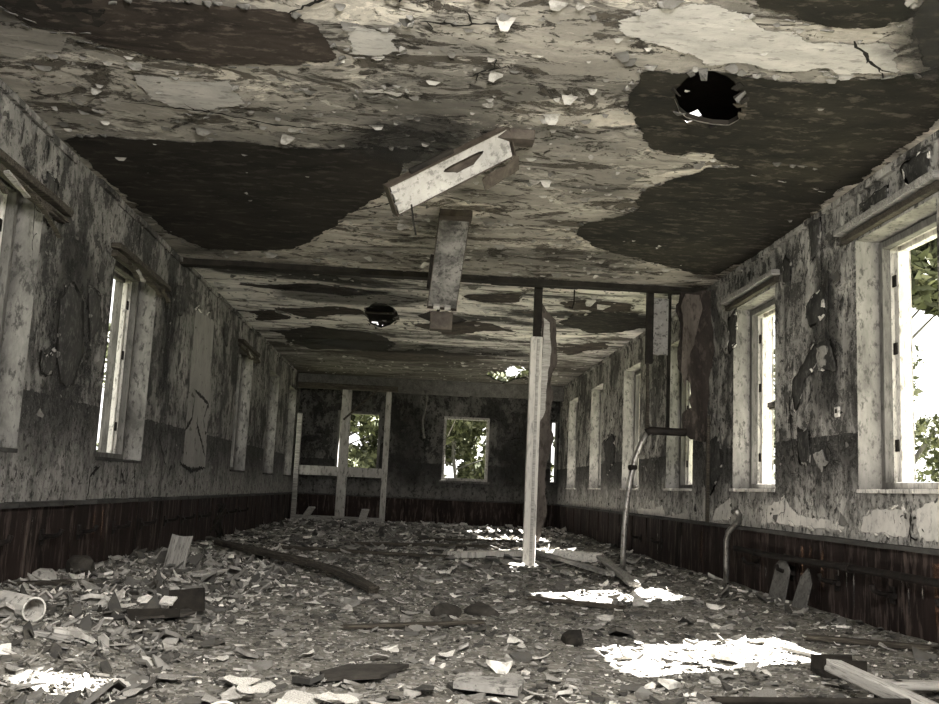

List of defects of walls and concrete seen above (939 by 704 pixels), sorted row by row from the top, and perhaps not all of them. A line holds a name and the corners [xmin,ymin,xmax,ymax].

peeling [0,0,415,68]
spalling [130,75,252,119]
spalling [354,85,410,101]
peeling [573,0,939,276]
peeling [64,134,411,252]
peeling [782,254,792,287]
peeling [805,285,825,328]
peeling [39,347,57,377]
peeling [791,338,838,413]
spalling [711,498,731,523]